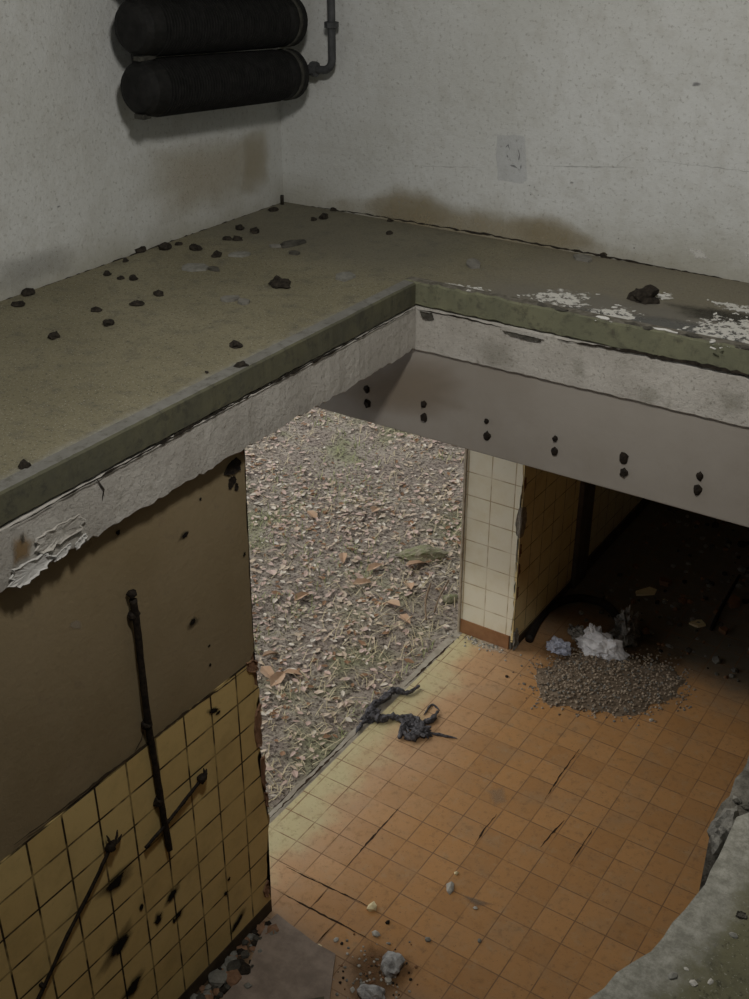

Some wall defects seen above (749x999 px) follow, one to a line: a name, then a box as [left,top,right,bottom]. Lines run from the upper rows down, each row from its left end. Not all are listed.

leakage [388,195,568,247]
spalling [502,330,543,342]
peeling [517,289,749,350]
peeling [8,514,88,588]
crack [546,750,579,797]
crack [348,809,398,865]
crack [282,867,367,939]